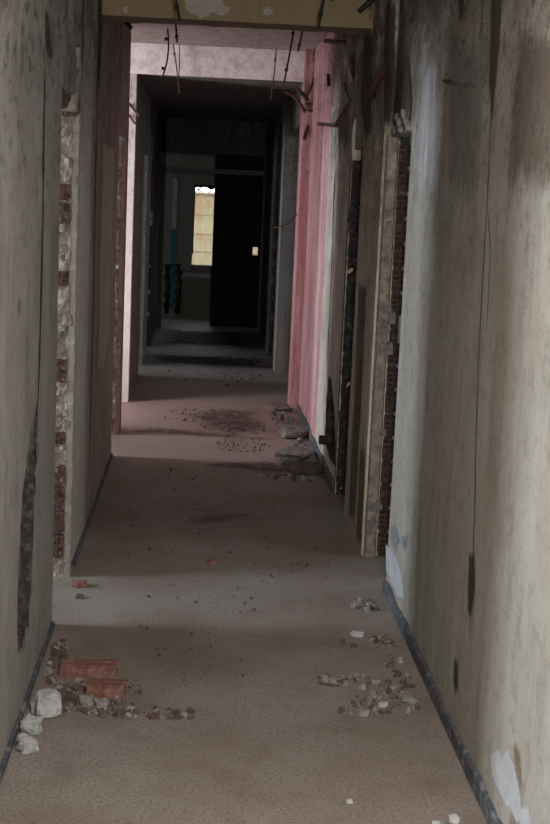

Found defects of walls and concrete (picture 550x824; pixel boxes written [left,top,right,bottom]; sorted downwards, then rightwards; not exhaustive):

peeling [491,748,531,824]